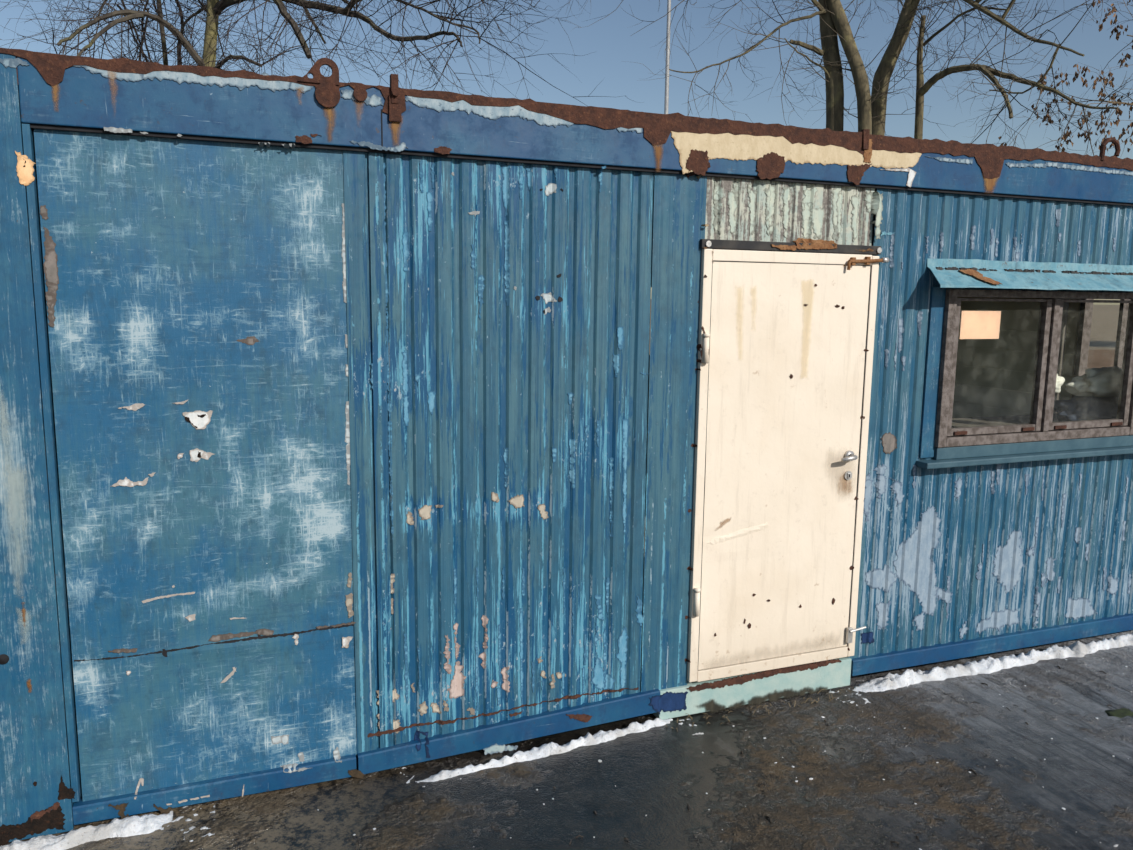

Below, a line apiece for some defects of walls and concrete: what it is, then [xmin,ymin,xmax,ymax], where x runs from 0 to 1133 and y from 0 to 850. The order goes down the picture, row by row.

corrosion [0,48,320,101]
corrosion [295,107,334,144]
corrosion [336,82,1133,193]
peeling [15,151,36,186]
corrosion [771,238,837,251]
peeling [175,399,213,429]
peeling [177,448,216,462]
peeling [865,506,953,631]
peeling [959,517,1098,639]
peeling [376,568,566,733]
corrosion [687,632,875,692]
corrosion [367,687,639,738]